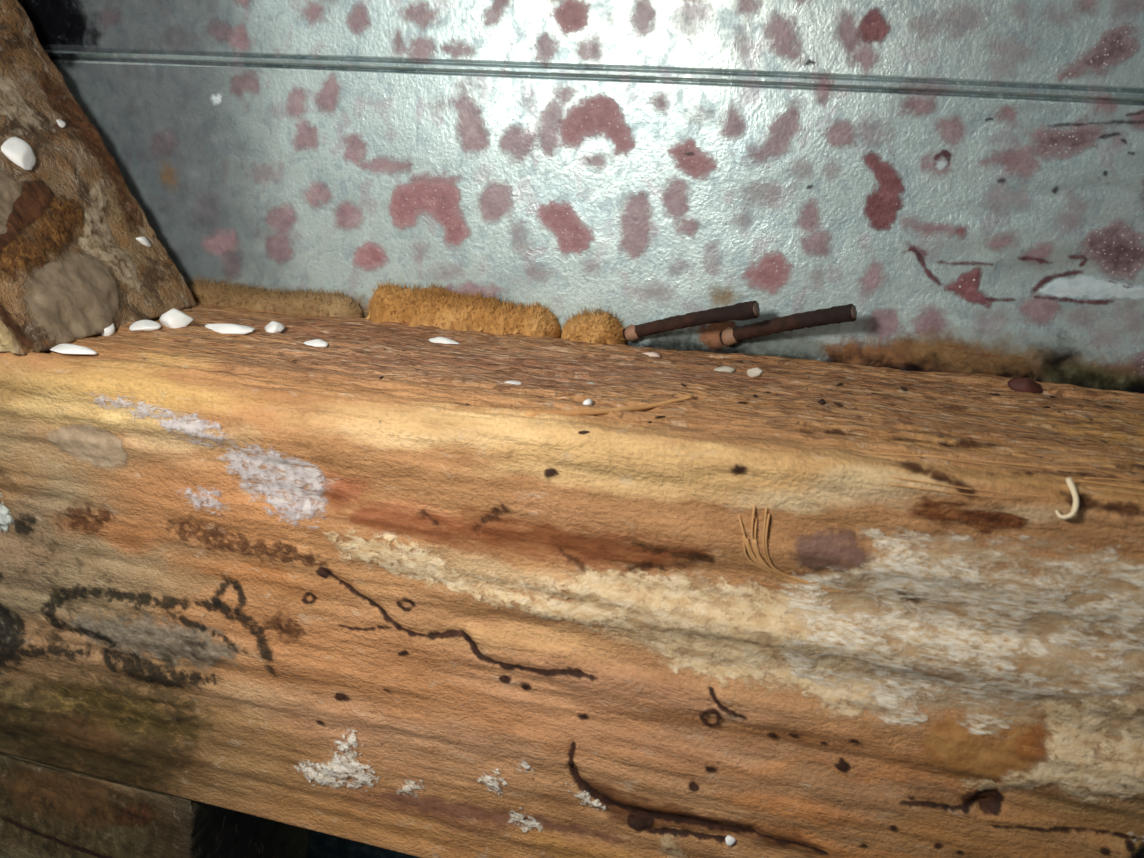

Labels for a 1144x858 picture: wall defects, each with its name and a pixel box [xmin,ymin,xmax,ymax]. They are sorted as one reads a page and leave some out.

corrosion [825,338,1133,382]
water stain [1044,353,1144,391]
water stain [0,496,34,534]
water stain [0,577,305,689]